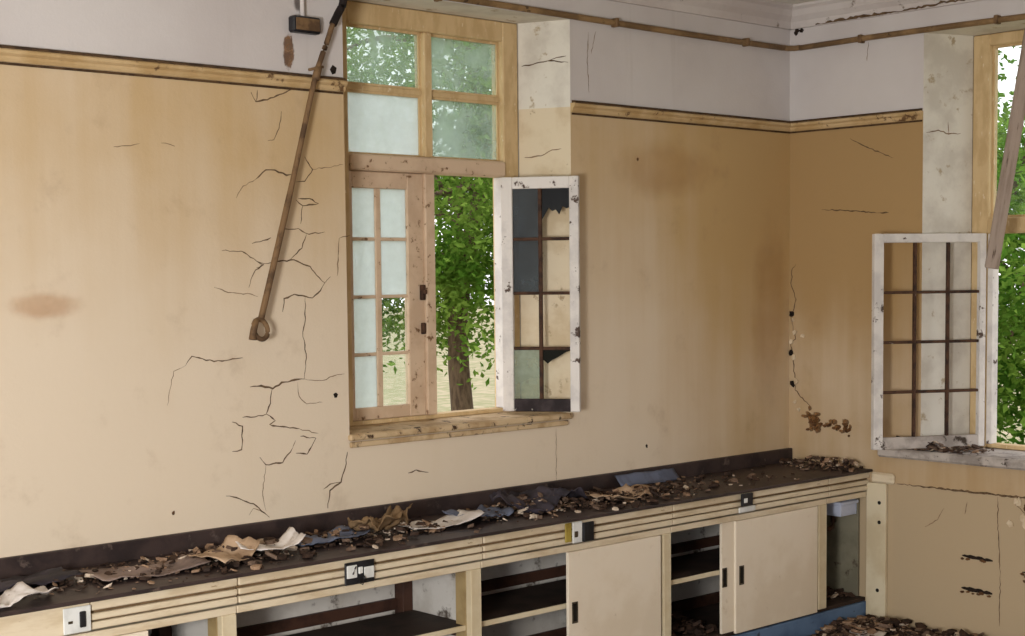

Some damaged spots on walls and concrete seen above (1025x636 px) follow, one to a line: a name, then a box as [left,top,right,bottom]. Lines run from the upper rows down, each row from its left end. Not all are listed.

crack [251,90,290,141]
crack [167,356,240,405]
crack [214,158,350,517]
crack [790,264,810,406]